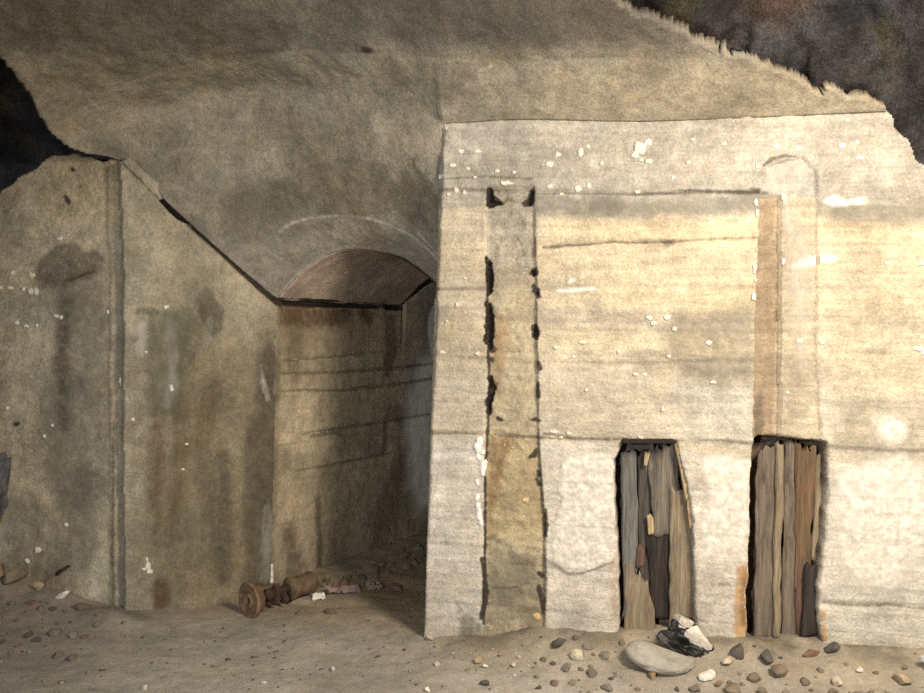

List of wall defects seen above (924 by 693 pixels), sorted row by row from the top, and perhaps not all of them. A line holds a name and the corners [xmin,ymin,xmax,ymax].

crack [480,256,503,624]
crack [529,267,586,619]
corrosion [736,566,748,637]